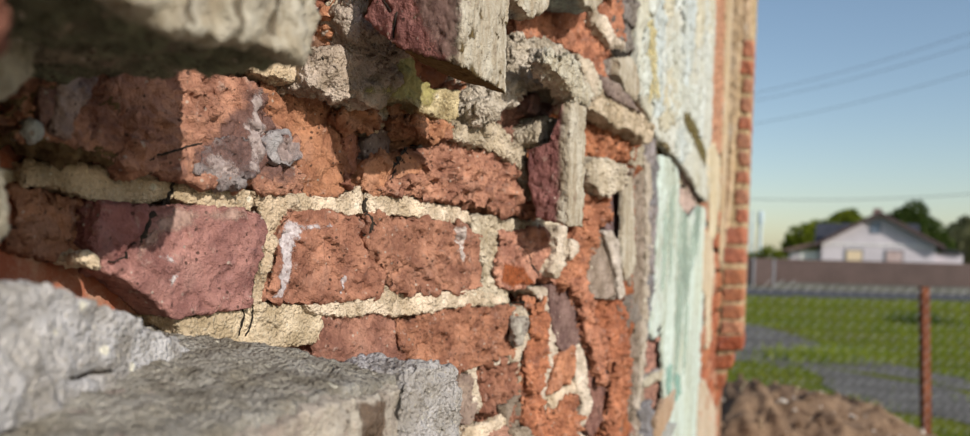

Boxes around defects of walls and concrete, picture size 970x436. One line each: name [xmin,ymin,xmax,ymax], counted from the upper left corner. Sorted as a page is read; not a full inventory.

crack [149,143,203,161]
crack [107,182,175,263]
crack [238,306,254,336]
peeling [661,188,701,401]